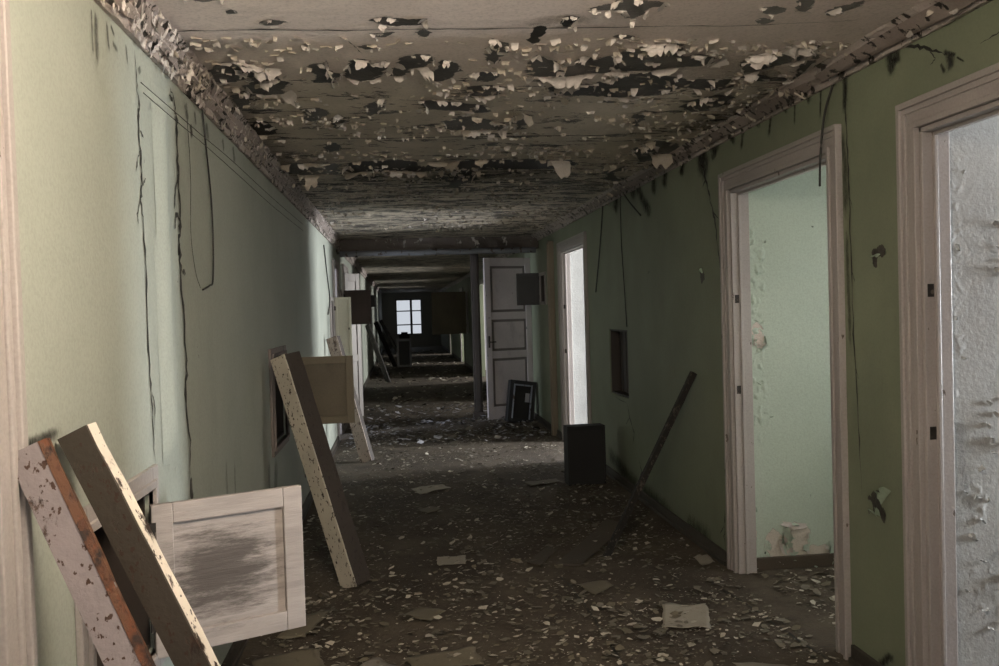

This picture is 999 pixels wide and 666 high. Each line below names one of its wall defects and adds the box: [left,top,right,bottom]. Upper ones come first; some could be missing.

crack [134,51,156,454]
crack [169,88,191,474]
peeling [102,0,977,243]
peeling [764,521,834,565]